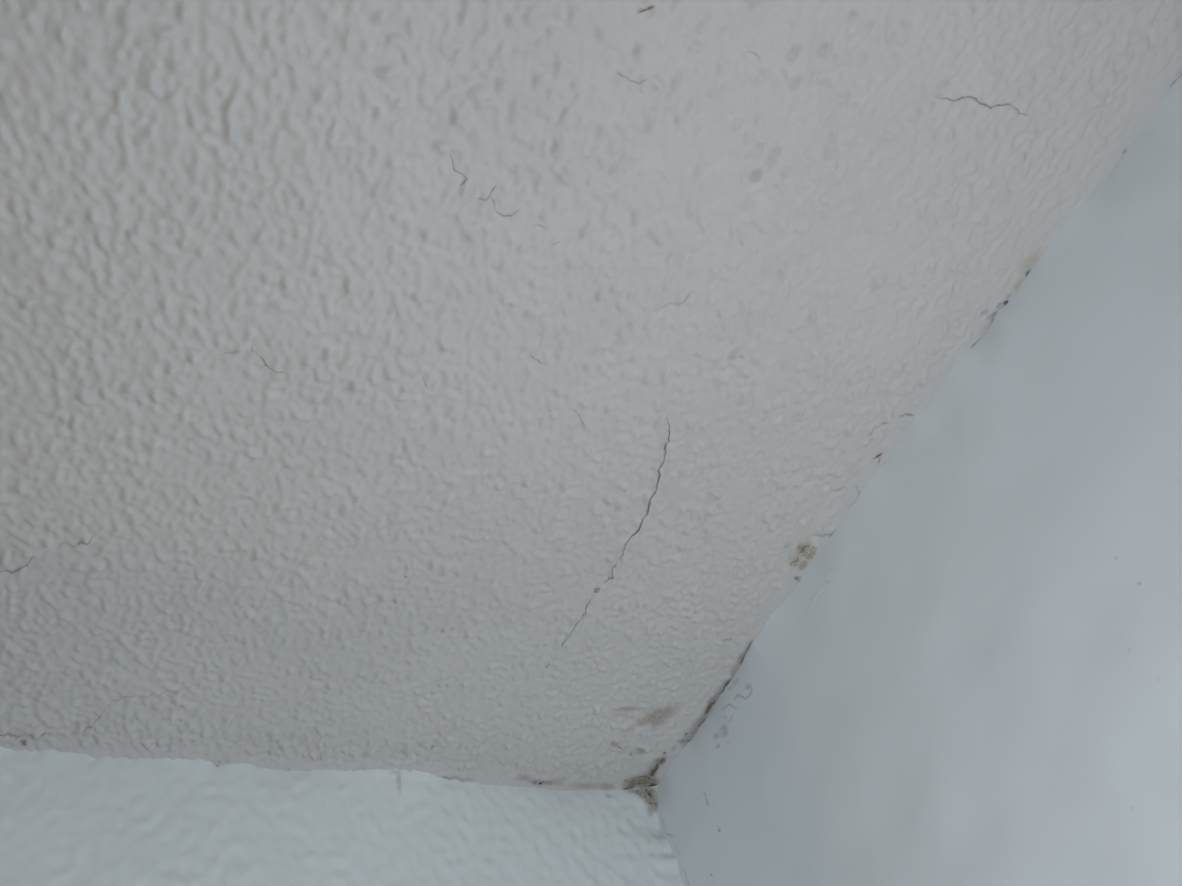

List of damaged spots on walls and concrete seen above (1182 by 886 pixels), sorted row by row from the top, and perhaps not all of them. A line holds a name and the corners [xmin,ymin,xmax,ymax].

crack [560,422,670,648]